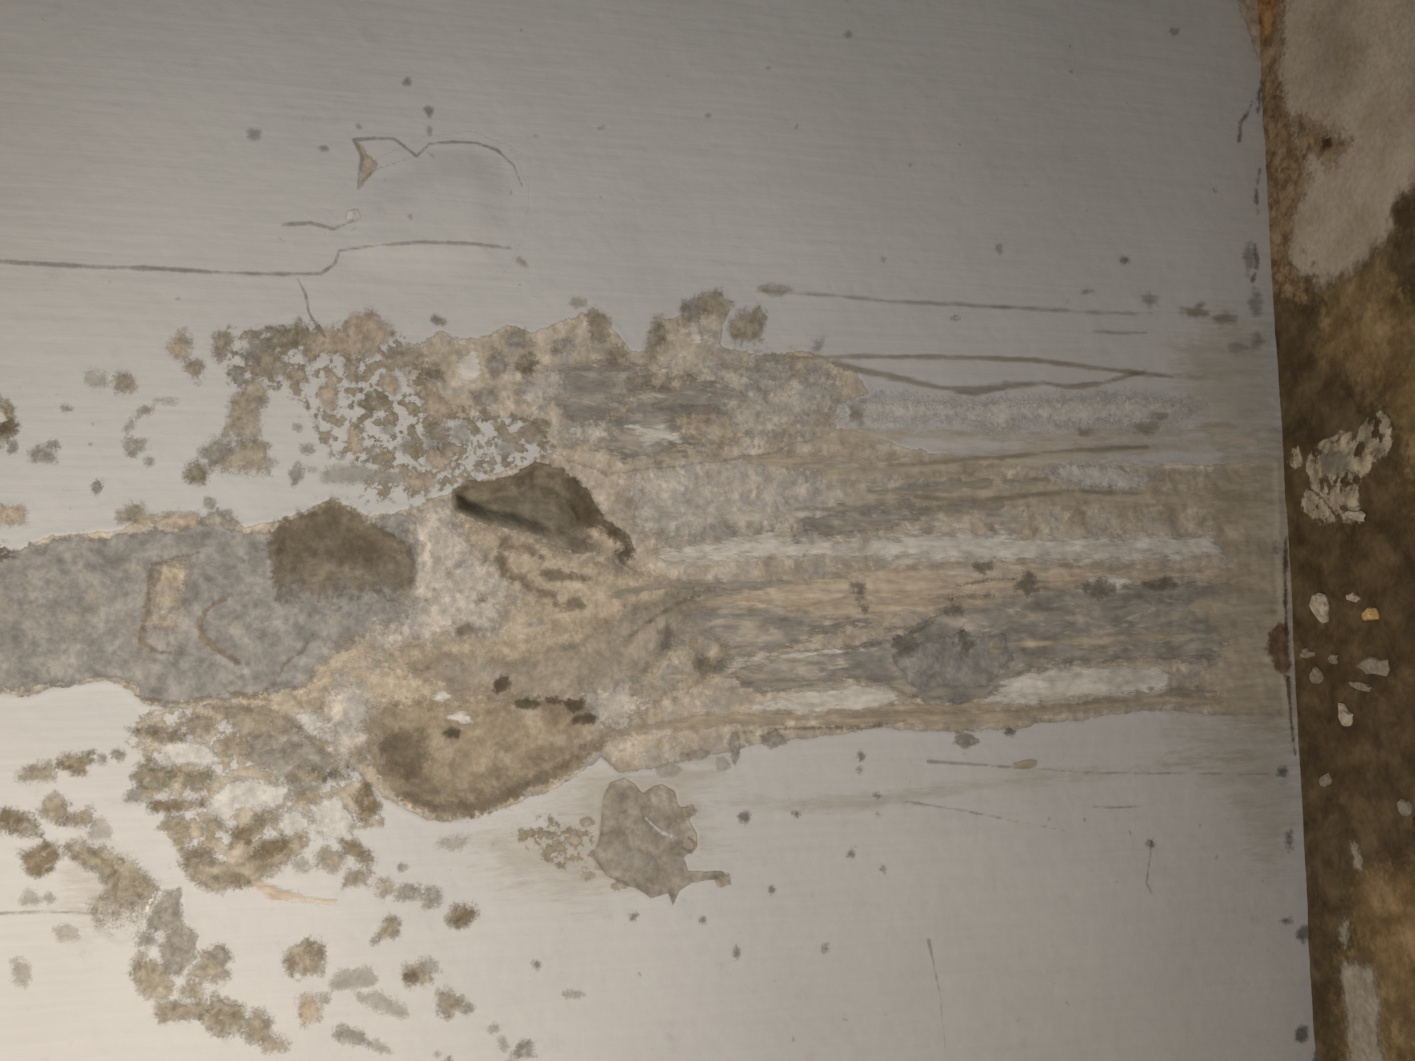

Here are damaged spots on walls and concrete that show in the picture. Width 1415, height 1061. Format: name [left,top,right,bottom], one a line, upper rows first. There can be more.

crack [10,260,77,268]
crack [128,265,208,273]
crack [243,138,501,337]
damp [815,346,1257,507]
peeling [0,285,1298,1053]
damp [1244,185,1415,1061]
peeling [489,1026,532,1061]